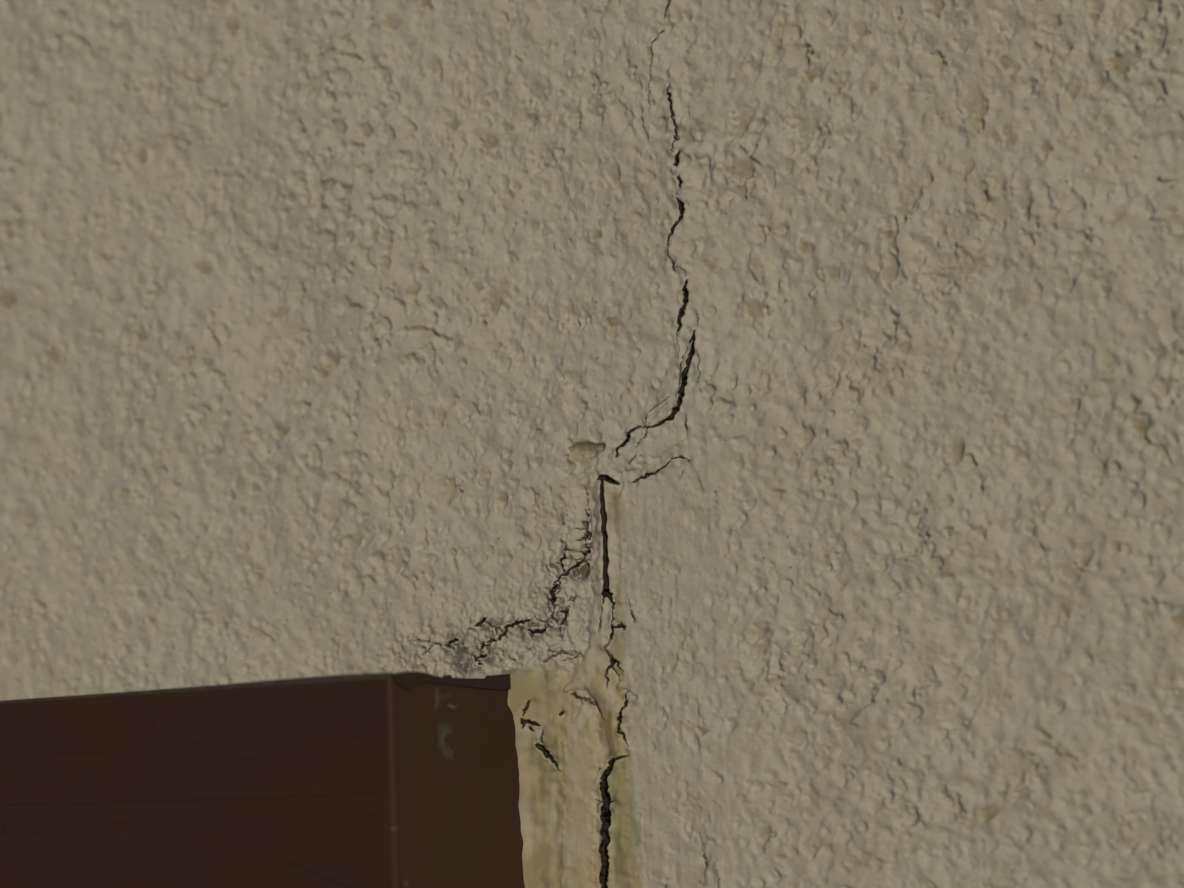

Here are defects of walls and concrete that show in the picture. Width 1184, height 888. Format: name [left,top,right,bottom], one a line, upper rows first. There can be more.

crack [520,700,560,771]
crack [571,0,700,888]